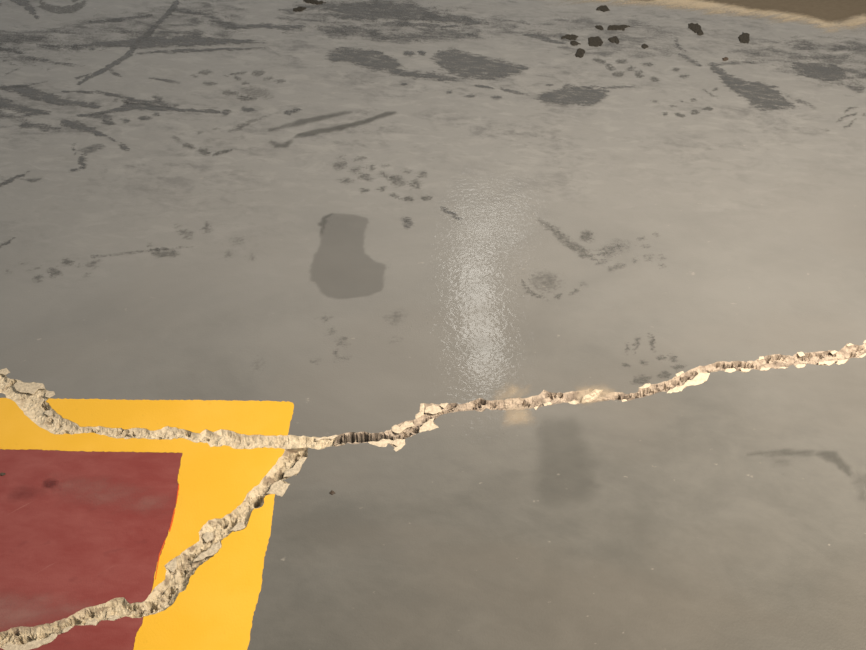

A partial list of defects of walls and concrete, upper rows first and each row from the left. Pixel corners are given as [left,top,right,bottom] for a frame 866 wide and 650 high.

damp [398,14,488,28]
damp [589,0,866,30]
crack [0,340,866,650]